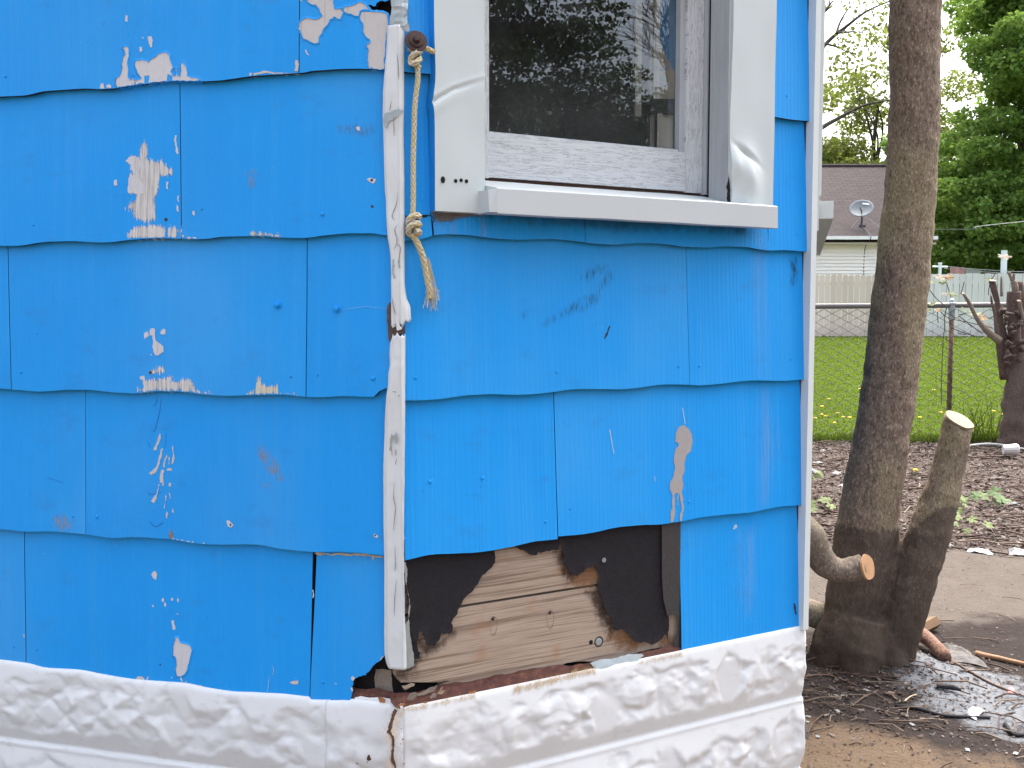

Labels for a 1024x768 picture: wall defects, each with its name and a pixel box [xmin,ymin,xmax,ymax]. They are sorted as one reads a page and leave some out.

peeling [100,36,203,91]
peeling [249,0,392,78]
peeling [114,139,197,241]
peeling [137,328,214,395]
peeling [247,376,295,396]
peeling [149,434,175,518]
peeling [152,598,203,687]
peeling [591,654,644,669]